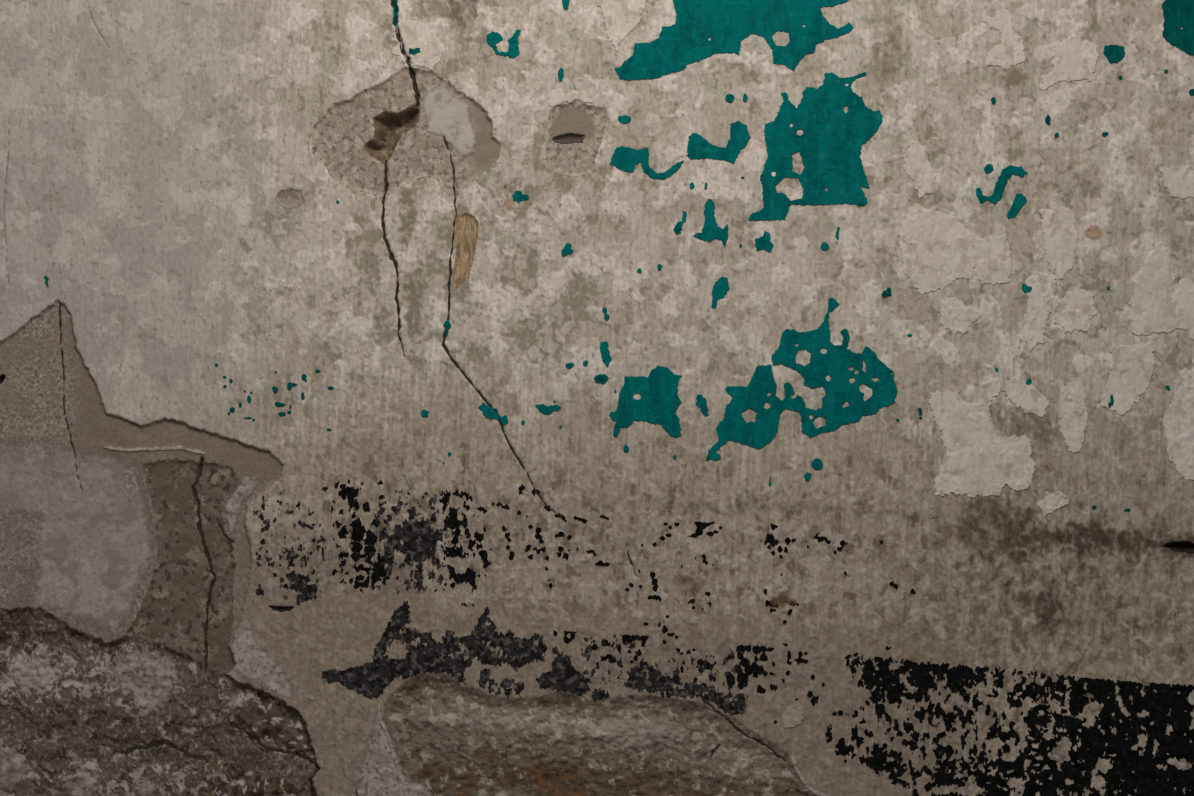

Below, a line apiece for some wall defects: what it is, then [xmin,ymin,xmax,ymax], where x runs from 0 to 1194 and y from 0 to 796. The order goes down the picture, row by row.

crack [391,0,420,107]
flaking render [311,0,502,288]
peeling [486,29,521,58]
peeling [545,68,883,252]
peeling [596,0,854,81]
peeling [1162,0,1194,55]
crack [381,160,405,356]
crack [442,136,563,520]
peeling [695,298,898,461]
crack [191,457,234,672]
flaking render [0,299,825,796]
peeling [825,646,1194,796]